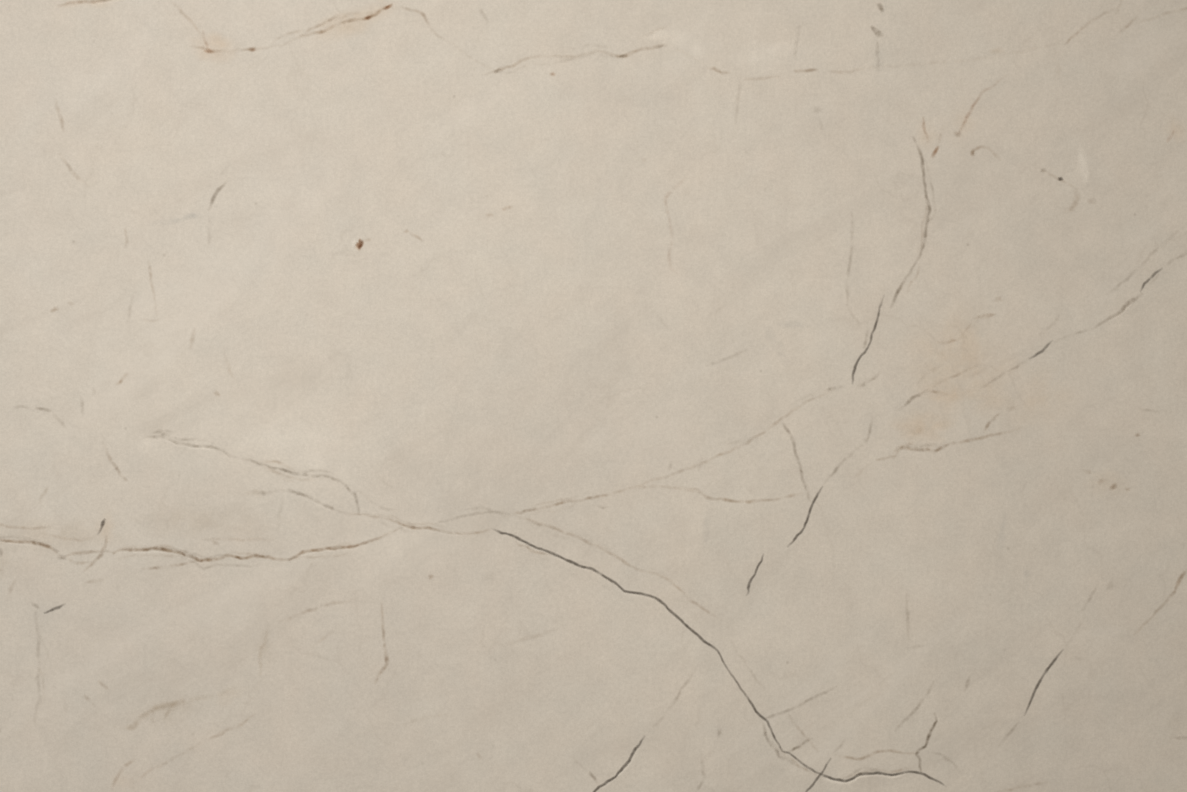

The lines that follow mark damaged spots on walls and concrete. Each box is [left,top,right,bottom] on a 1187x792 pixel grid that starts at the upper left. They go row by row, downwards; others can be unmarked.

crack [500,532,723,661]
crack [594,746,643,792]
crack [809,771,932,791]